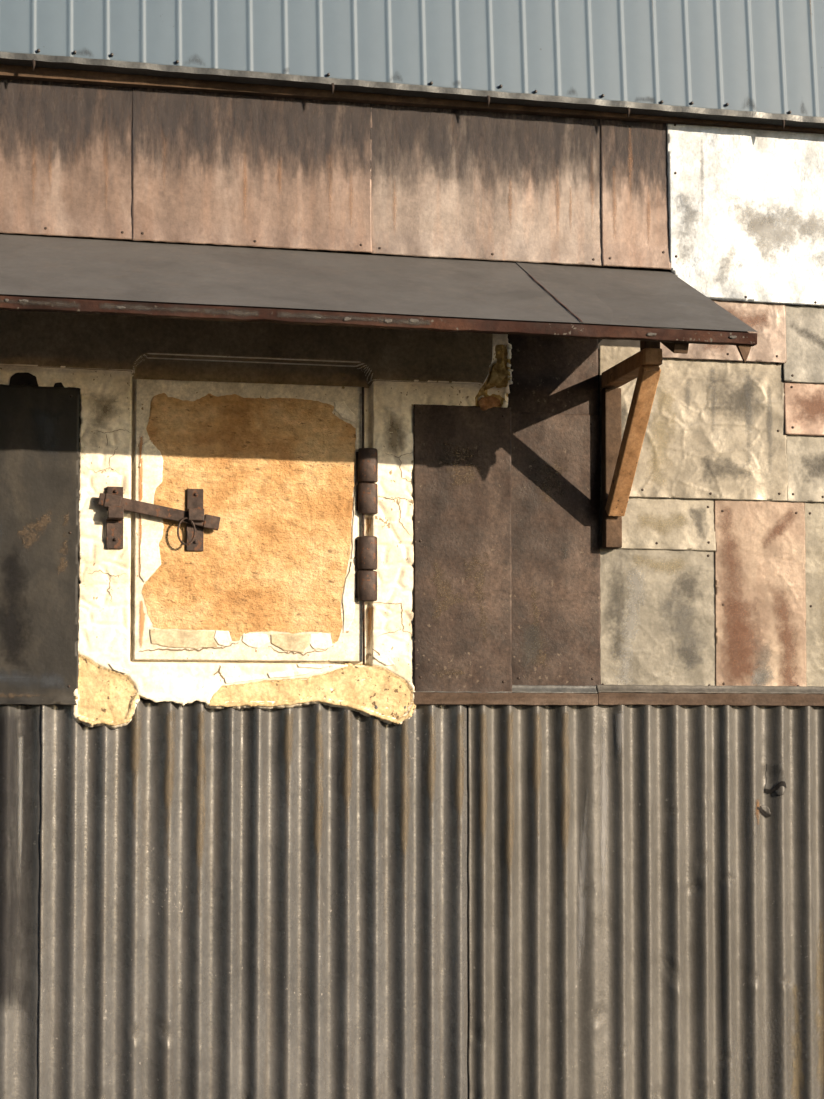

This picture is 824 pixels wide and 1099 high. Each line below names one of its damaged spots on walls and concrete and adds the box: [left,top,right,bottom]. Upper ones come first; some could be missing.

spalling [475,344,511,411]
corrosion [798,397,824,418]
peeling [140,393,416,725]
crack [384,453,413,535]
corrosion [771,514,792,537]
crack [373,602,410,656]
corrosion [725,537,758,681]
corrosion [776,596,796,686]
spalling [74,654,140,726]